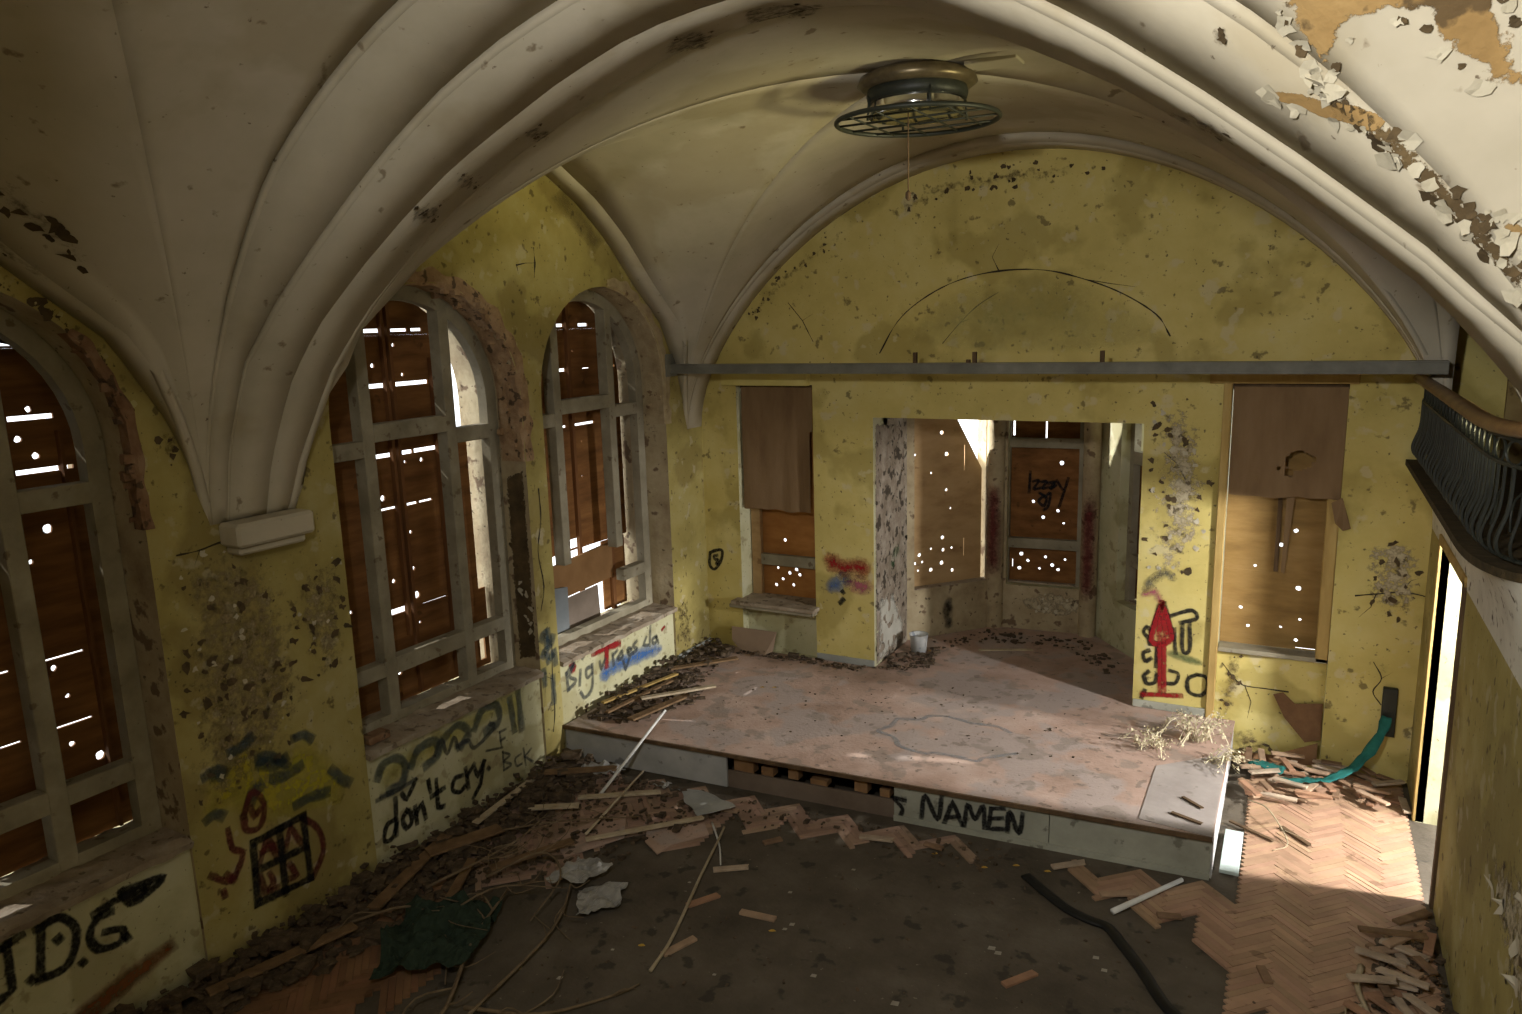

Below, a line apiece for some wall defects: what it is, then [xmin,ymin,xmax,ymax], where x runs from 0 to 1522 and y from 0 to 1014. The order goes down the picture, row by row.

peeling [1255,0,1522,308]
crack [879,246,1171,353]
peeling [179,550,354,806]
spalling [875,424,906,663]
peeling [1142,398,1215,576]
peeling [1369,540,1424,623]